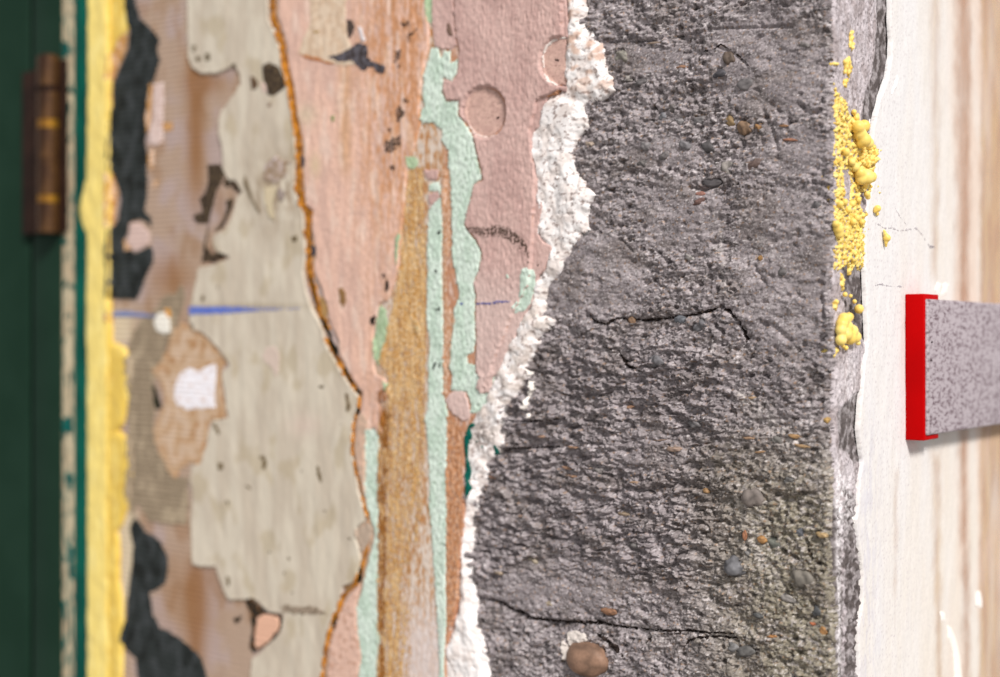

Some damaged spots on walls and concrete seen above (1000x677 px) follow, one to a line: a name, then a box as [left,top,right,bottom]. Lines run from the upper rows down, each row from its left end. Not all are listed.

peeling [149,82,164,166]
peeling [126,222,150,251]
spalling [153,0,898,677]
crack [590,307,750,372]
crack [481,597,738,657]